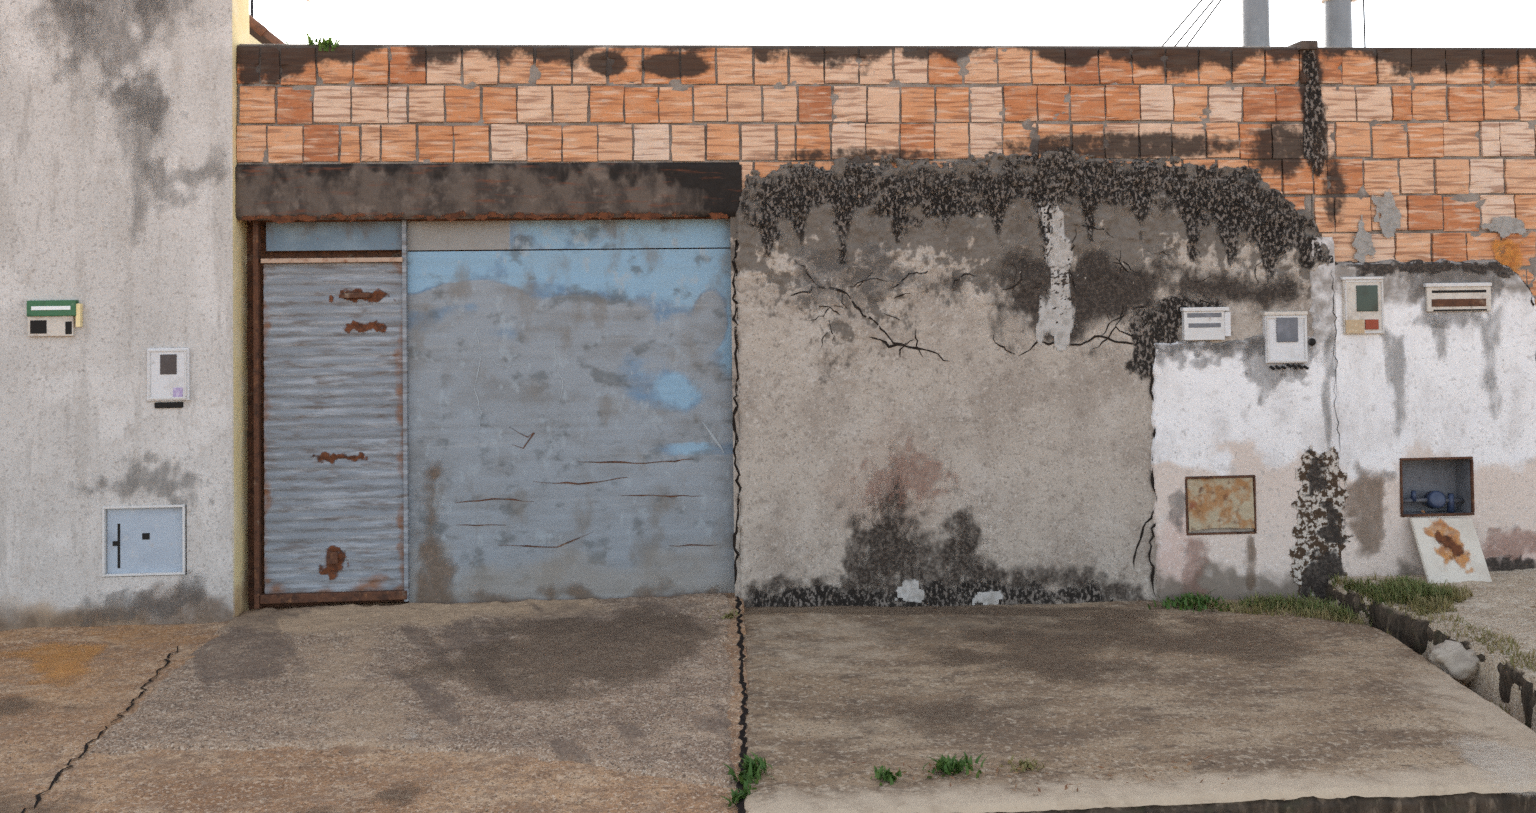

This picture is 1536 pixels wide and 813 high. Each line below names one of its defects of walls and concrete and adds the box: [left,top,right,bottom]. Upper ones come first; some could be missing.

corrosion [329,288,387,333]
corrosion [312,452,368,464]
crack [791,224,1222,597]
leakage [727,480,1143,608]
corrosion [1425,519,1473,572]
crack [21,645,179,813]